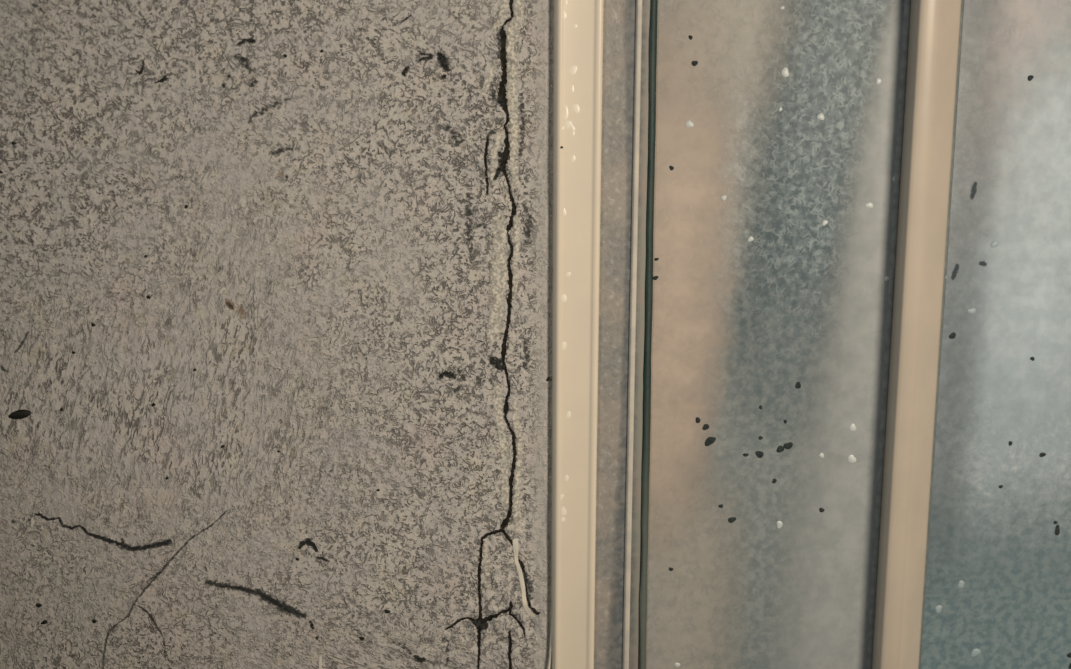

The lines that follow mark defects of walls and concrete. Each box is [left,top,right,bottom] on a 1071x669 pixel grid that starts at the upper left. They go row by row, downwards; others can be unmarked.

crack [12,512,226,669]
crack [445,0,540,669]